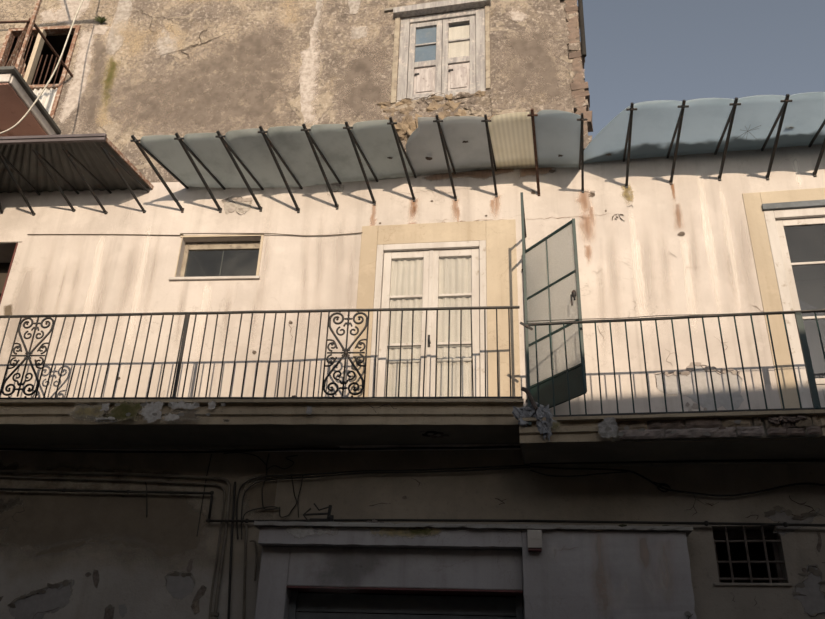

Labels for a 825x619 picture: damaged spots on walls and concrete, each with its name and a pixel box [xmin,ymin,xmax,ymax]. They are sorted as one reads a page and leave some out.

leakage [85,34,118,128]
corrosion [578,191,594,259]
corrosion [671,184,681,227]
spalling [126,400,226,423]
peeling [598,362,822,439]
peeling [0,580,74,619]